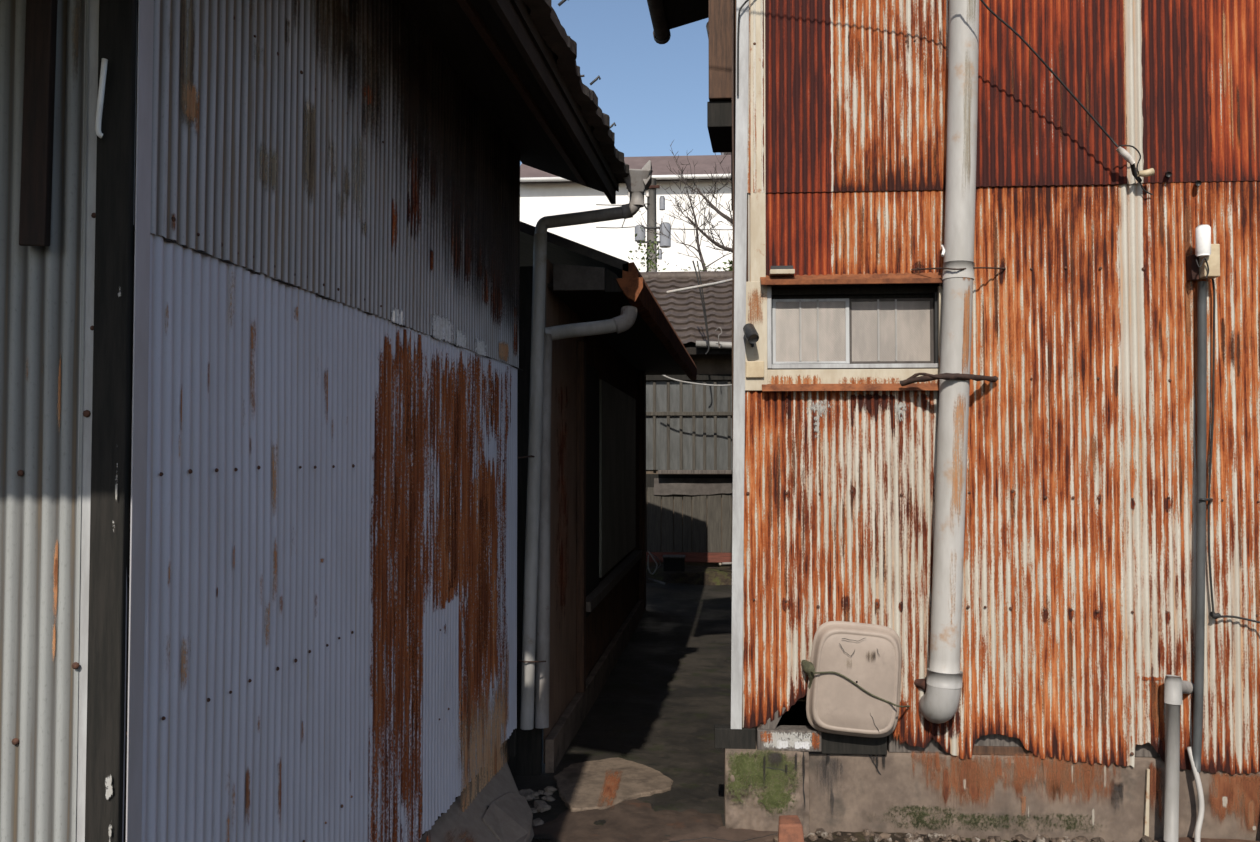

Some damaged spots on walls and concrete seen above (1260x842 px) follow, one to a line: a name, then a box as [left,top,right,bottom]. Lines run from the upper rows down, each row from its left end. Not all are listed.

corrosion [392,138,434,255]
corrosion [368,198,518,842]
corrosion [743,0,1260,829]
water stain [1104,765,1123,808]